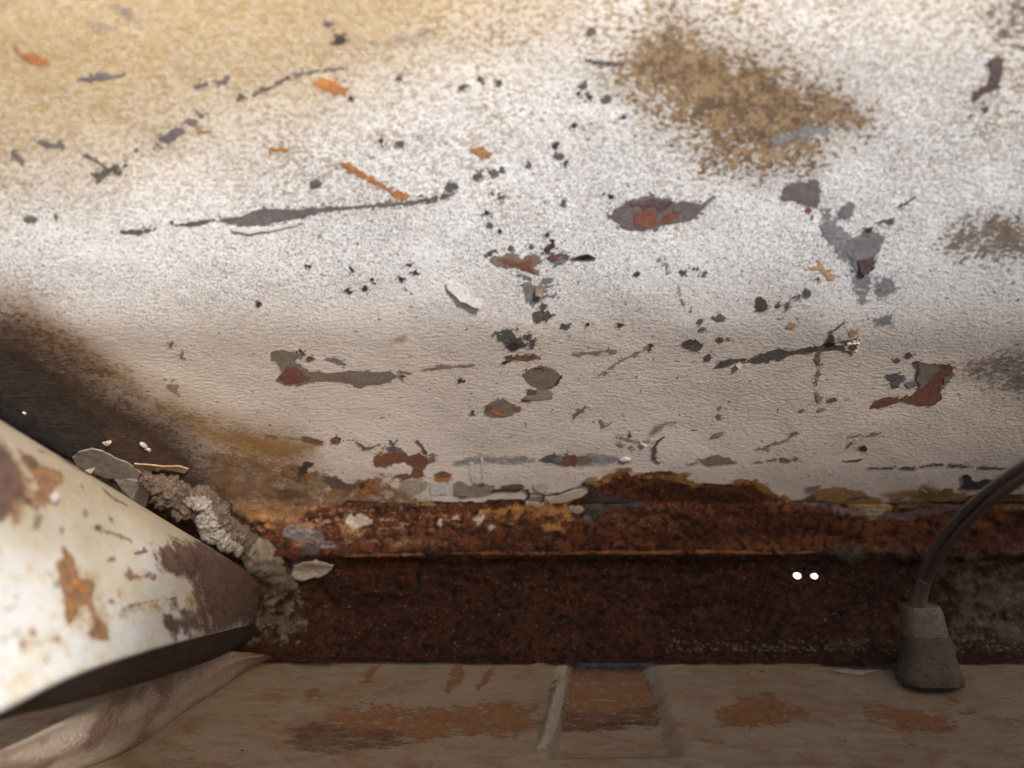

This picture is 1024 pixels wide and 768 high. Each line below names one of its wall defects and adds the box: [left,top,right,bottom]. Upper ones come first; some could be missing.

peeling [170,180,461,234]
rust [340,162,410,202]
peeling [472,166,506,233]
peeling [602,192,715,232]
peeling [779,179,901,303]
peeling [470,232,596,417]
peeling [270,349,411,388]
peeling [871,350,956,410]
peeling [263,454,992,581]
rust [798,484,972,521]
rust [290,663,543,755]
rust [714,691,812,733]